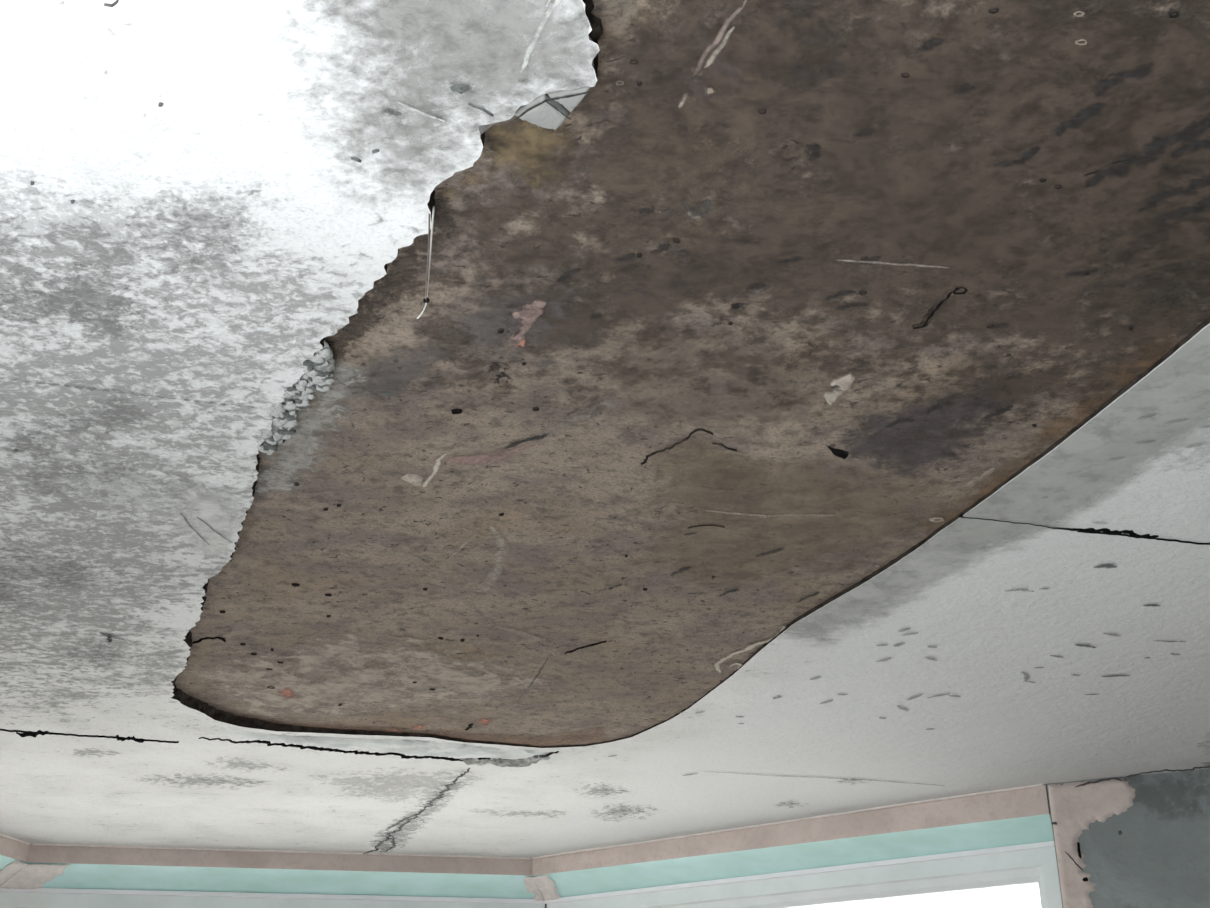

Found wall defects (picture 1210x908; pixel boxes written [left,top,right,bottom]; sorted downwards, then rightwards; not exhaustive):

crack [960,515,1210,545]
damp [200,632,545,720]
damp [714,626,786,673]
crack [0,728,502,854]